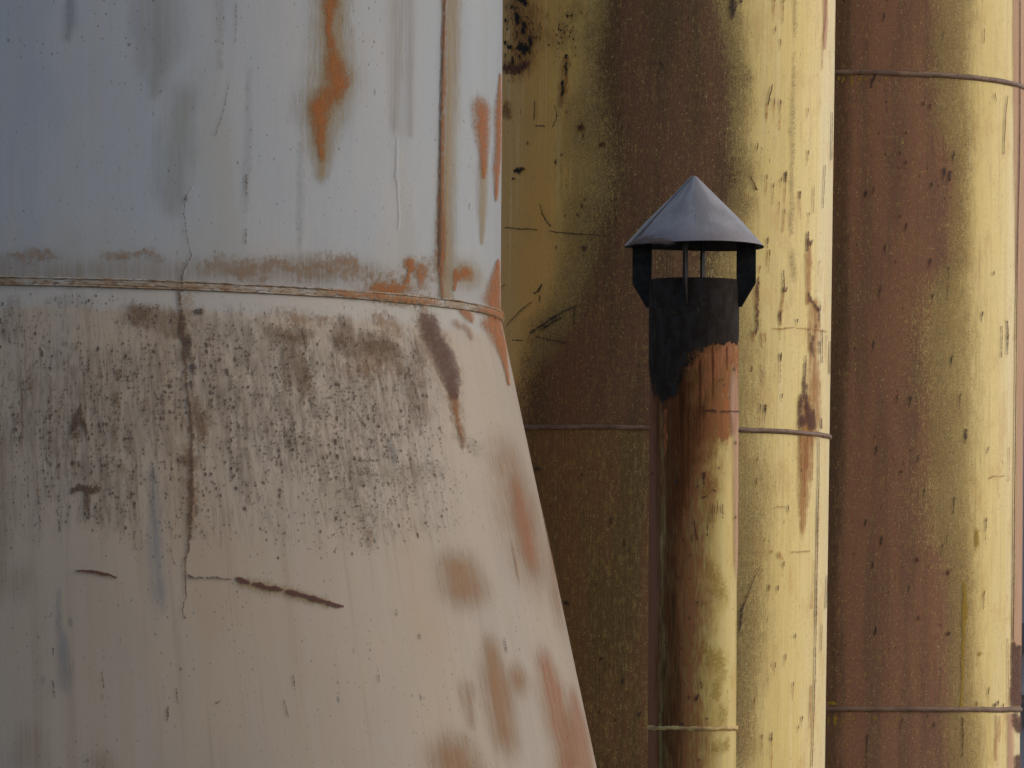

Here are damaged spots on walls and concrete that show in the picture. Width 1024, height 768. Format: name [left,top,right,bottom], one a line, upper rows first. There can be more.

corrosion [70,483,101,516]
crack [178,195,232,619]
corrosion [307,0,350,178]
corrosion [328,0,475,445]
corrosion [457,259,510,385]
corrosion [473,74,525,242]
corrosion [637,316,739,768]
corrosion [766,53,823,532]